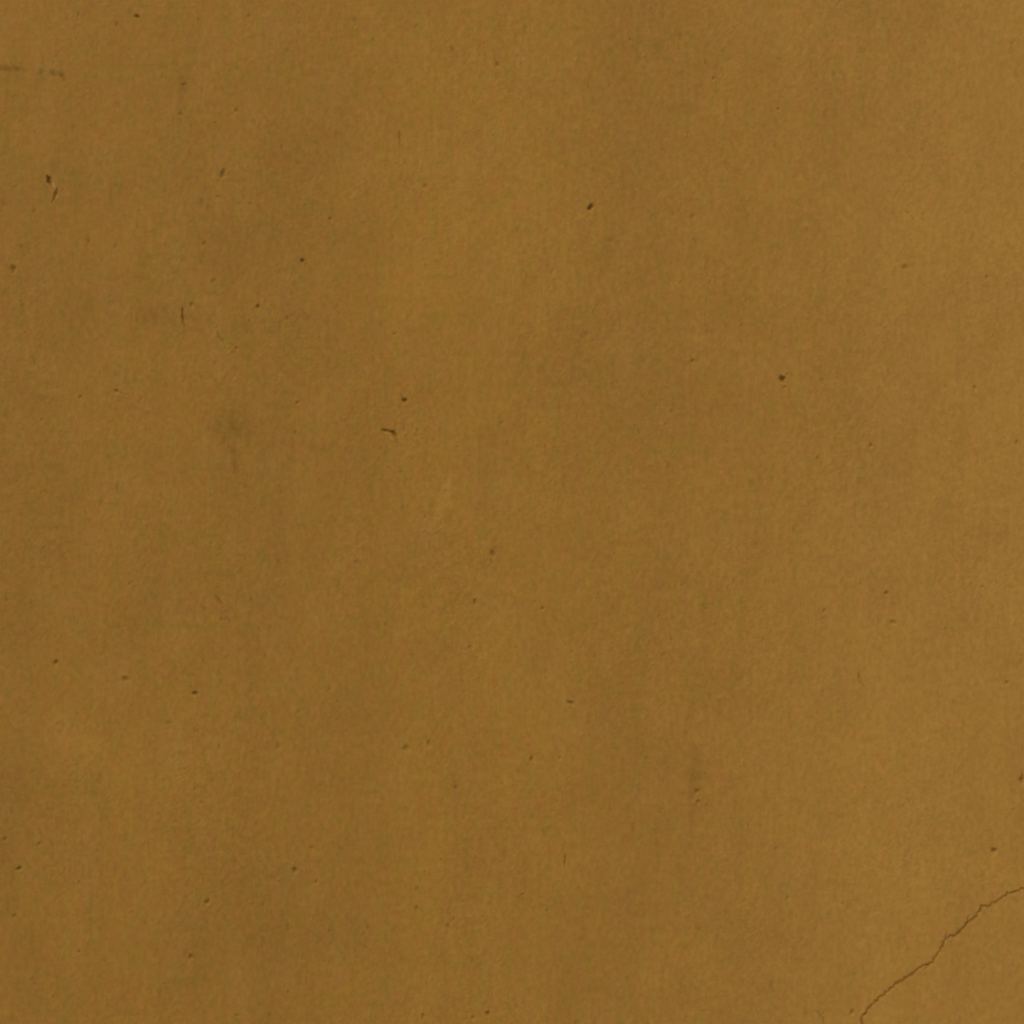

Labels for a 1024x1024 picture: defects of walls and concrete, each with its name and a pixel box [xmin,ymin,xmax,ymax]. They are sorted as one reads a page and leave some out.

crack [859,887,1024,1024]